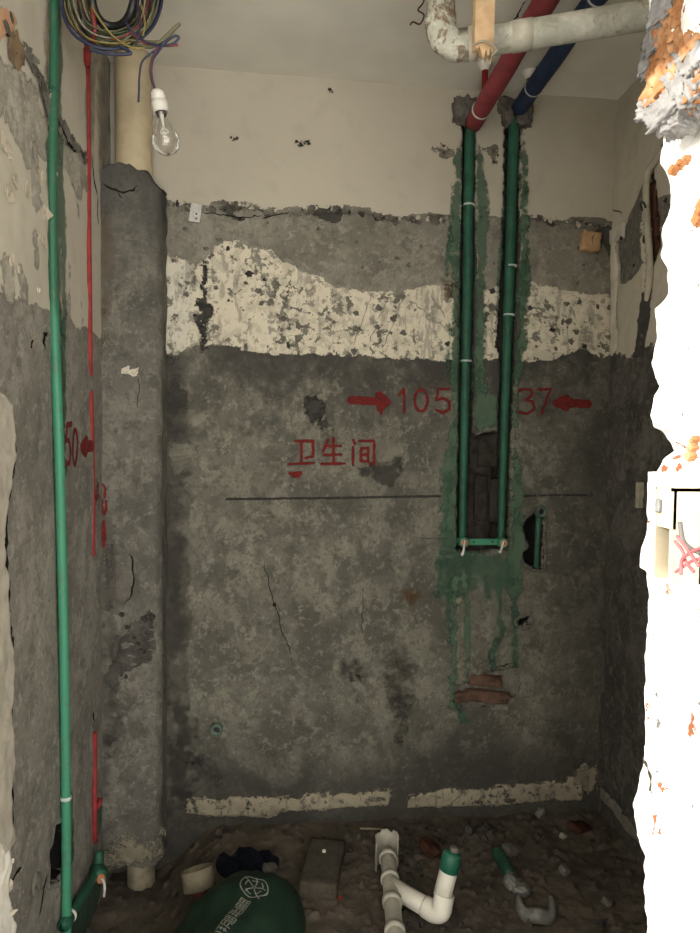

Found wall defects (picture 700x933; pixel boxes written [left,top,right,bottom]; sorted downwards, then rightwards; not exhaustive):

peeling [0,8,88,221]
crack [92,160,138,225]
peeling [0,252,40,304]
peeling [32,229,48,270]
peeling [166,200,460,362]
flaking render [474,216,503,361]
peeling [517,183,671,363]
flaking render [106,610,159,700]
crack [264,561,293,664]